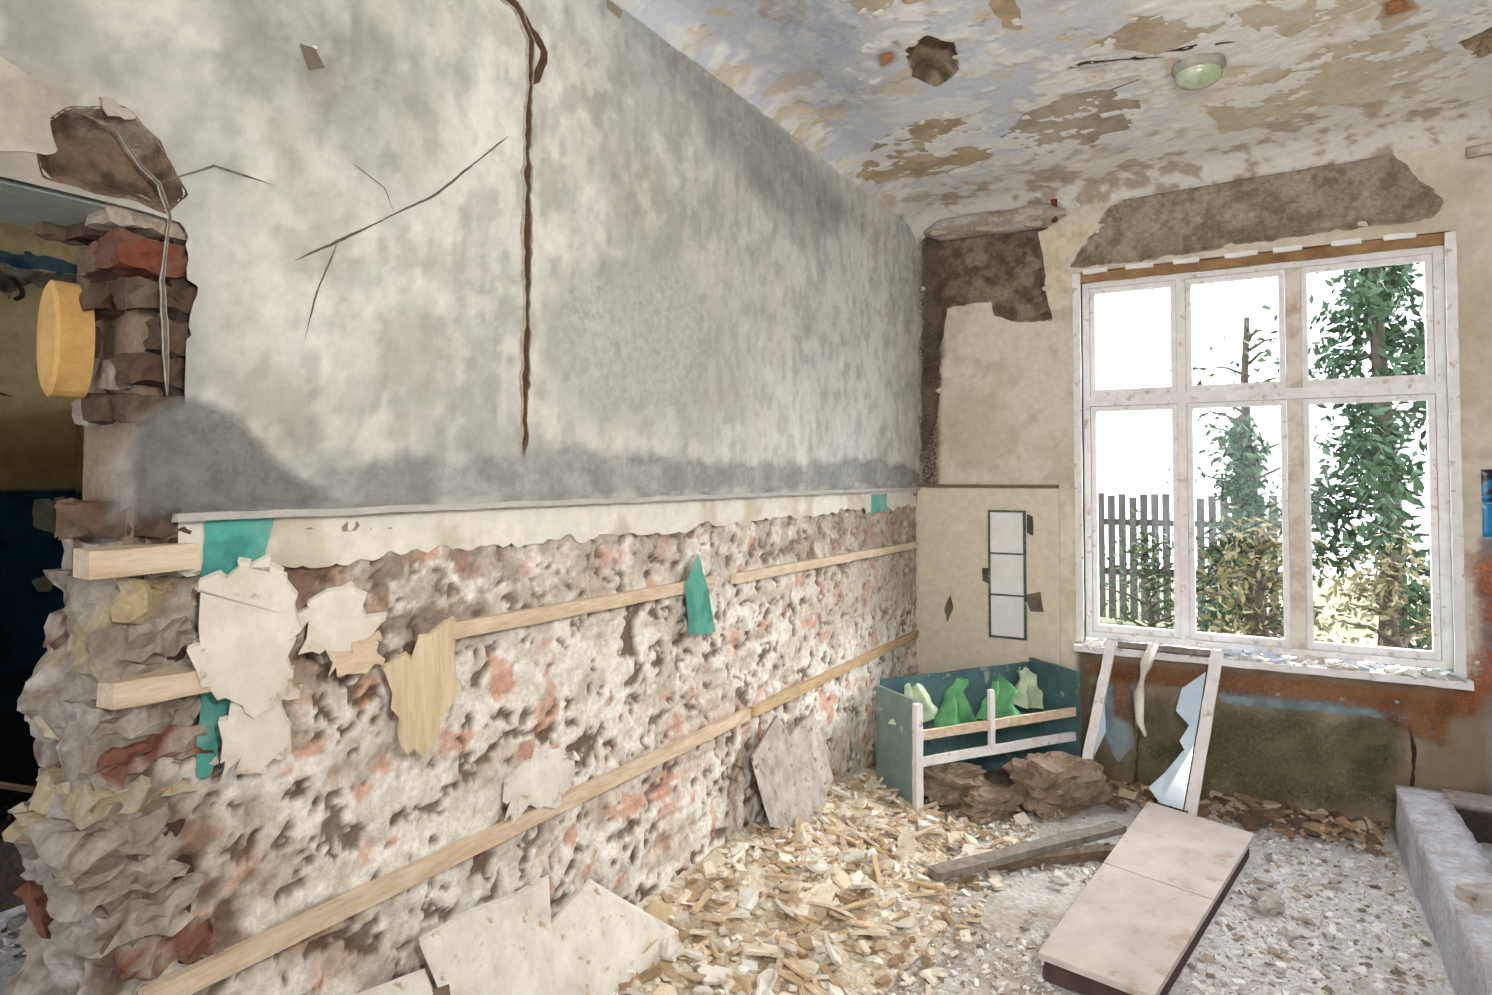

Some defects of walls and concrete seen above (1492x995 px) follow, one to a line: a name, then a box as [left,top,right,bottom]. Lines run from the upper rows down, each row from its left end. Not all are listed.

flaking render [899,35,962,87]
peeling [1087,0,1492,134]
flaking render [0,55,188,214]
peeling [856,112,997,185]
peeling [1009,90,1141,157]
flaking render [0,250,77,299]
crack [295,0,548,458]
flaking render [920,154,1444,457]
peeling [685,554,715,635]
peeling [186,517,387,784]
corrosion [1089,651,1492,745]
peeling [503,739,580,824]